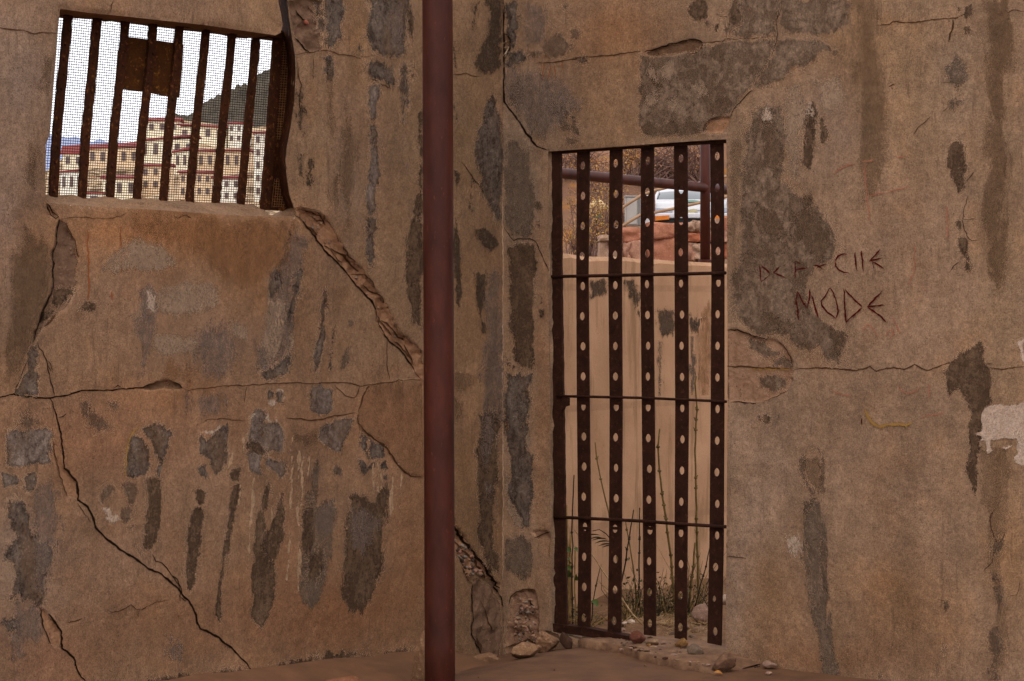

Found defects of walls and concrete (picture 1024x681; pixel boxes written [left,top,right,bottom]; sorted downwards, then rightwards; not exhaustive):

crack [503,1,546,150]
spalling [645,39,703,57]
crack [0,341,251,669]
damp [99,423,174,555]
damp [184,287,403,628]
spalling [294,210,424,390]
damp [453,0,587,582]
crack [794,362,951,372]
damp [943,342,992,496]
peeling [1003,436,1024,465]
crack [49,614,86,681]
spalling [455,524,559,654]